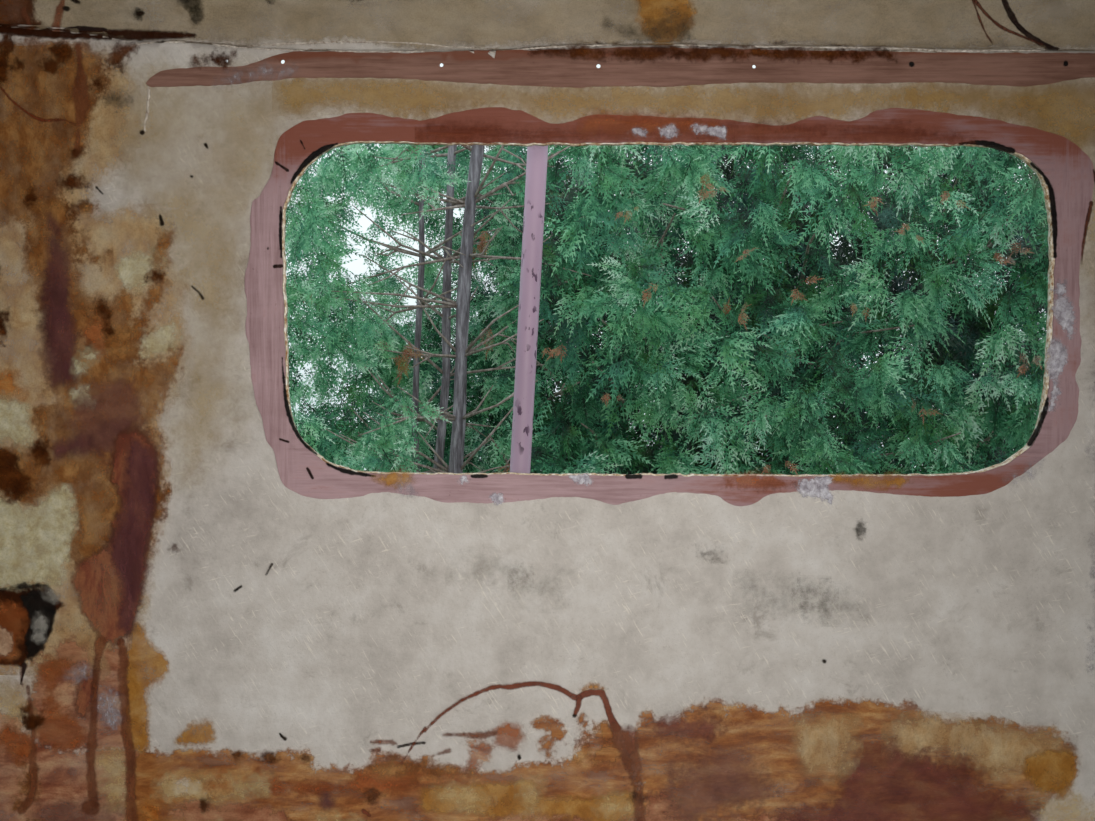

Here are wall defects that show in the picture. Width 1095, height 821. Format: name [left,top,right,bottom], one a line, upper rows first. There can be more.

damp [32,0,1095,52]
rust [530,43,894,62]
crack [972,0,1059,50]
damp [37,54,229,452]
crack [1081,169,1095,259]
rust [0,0,636,821]
damp [0,187,168,751]
spalling [0,582,62,667]
rust [635,699,1077,821]